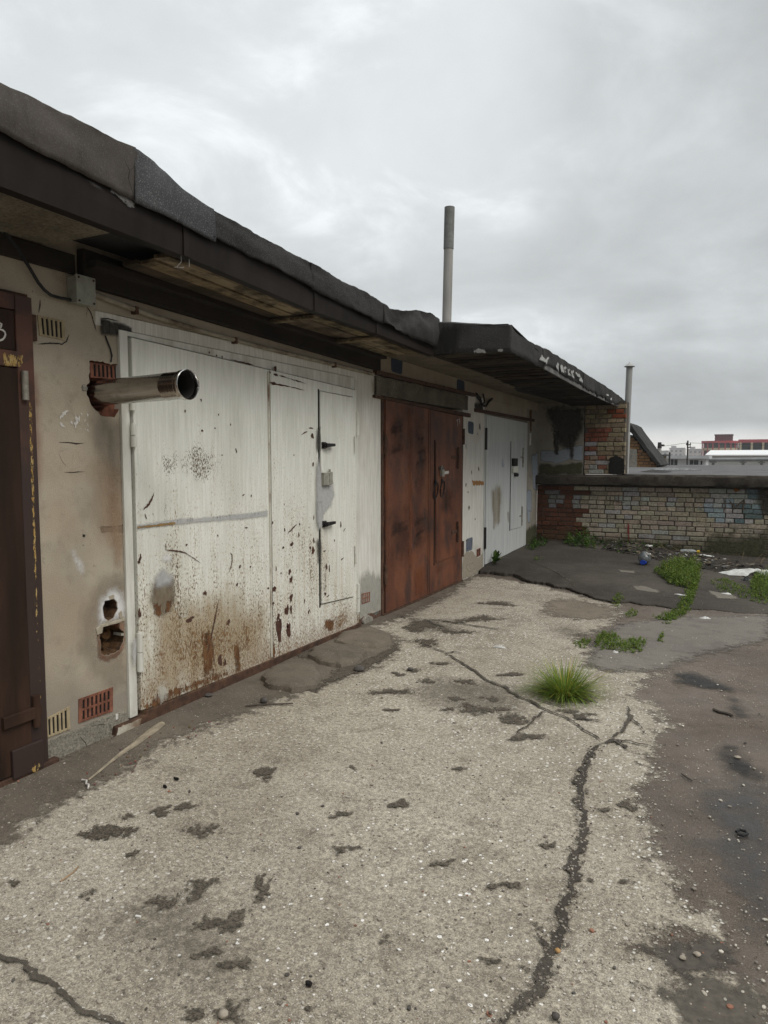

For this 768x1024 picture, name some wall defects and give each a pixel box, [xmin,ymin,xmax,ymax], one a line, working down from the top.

spalling [81,362,116,391]
spalling [60,405,115,431]
rust [163,442,222,482]
spalling [95,595,125,661]
rust [146,555,275,709]
rust [322,603,360,633]
crack [393,614,649,1024]
crack [0,953,125,1024]